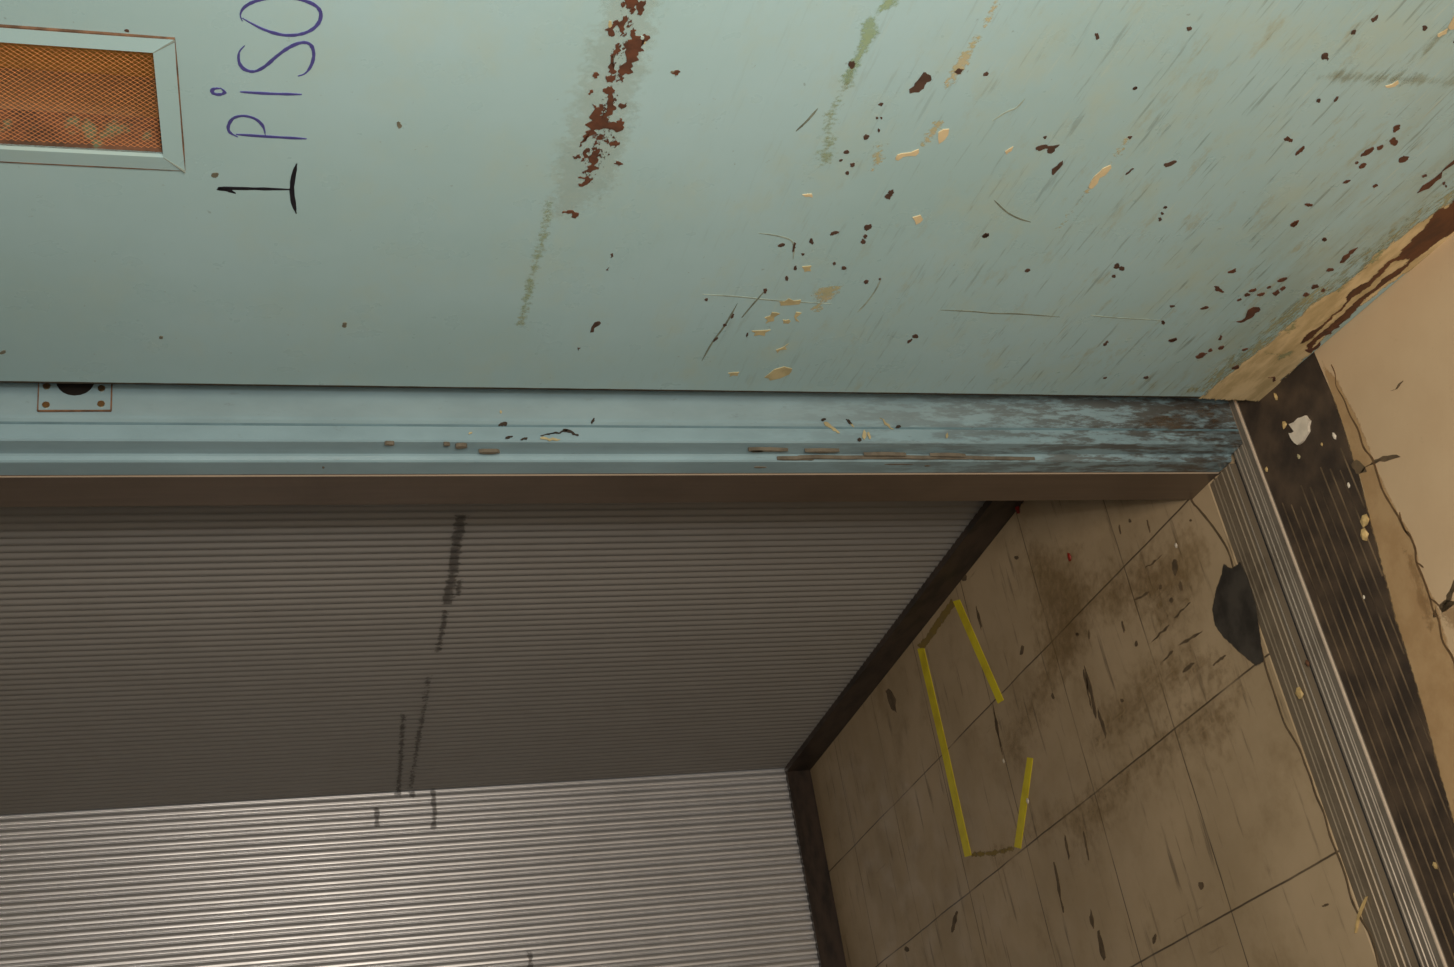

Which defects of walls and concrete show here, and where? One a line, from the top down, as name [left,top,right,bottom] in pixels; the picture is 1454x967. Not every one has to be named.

leakage [843,0,895,84]
spalling [909,6,997,93]
peeling [1422,16,1454,43]
corrosion [573,0,650,187]
peeling [1089,165,1134,189]
spalling [1343,125,1409,183]
peeling [746,231,839,337]
peeling [1187,160,1454,402]
spalling [444,410,595,454]
spalling [748,418,1035,468]
spalling [1121,556,1191,647]
peeling [1163,499,1380,967]